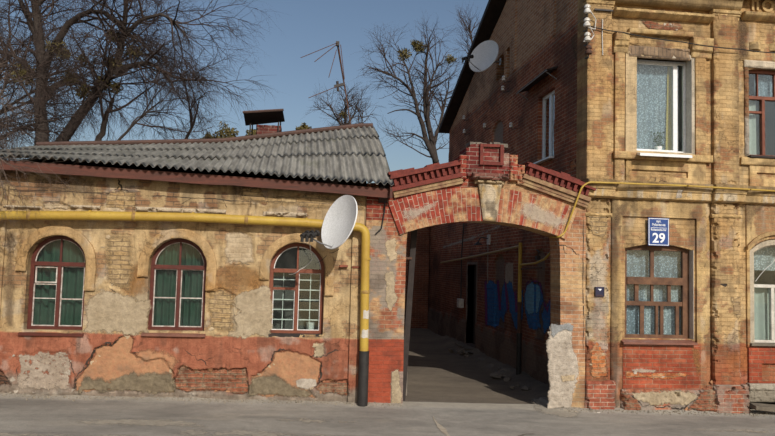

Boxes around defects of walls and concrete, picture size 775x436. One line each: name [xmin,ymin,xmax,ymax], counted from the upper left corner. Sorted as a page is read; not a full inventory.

crack [67,337,139,389]
flaking render [0,335,348,398]
peeling [547,323,579,409]
spalling [589,343,607,378]
spalling [621,391,641,410]
spalling [684,380,717,412]